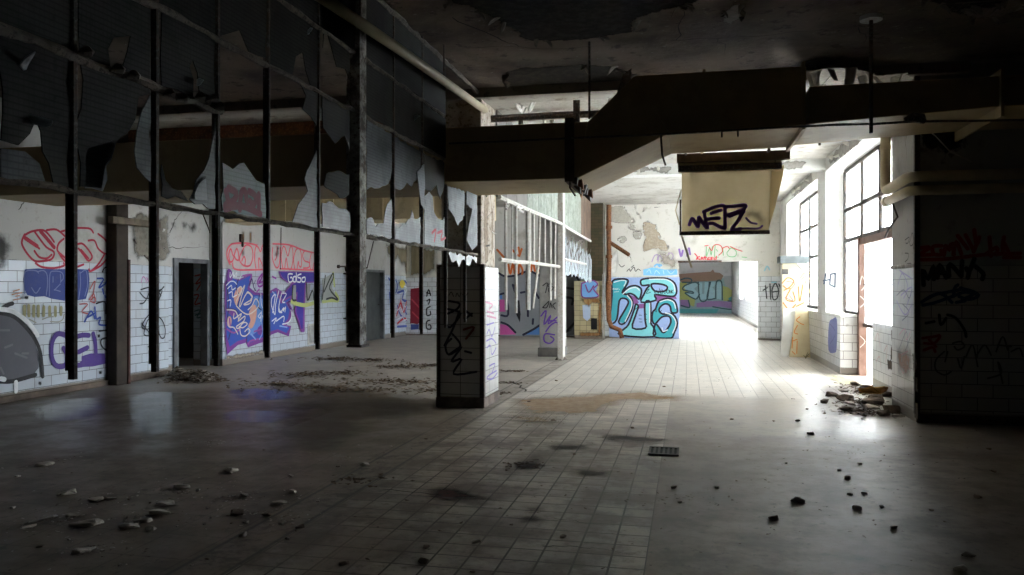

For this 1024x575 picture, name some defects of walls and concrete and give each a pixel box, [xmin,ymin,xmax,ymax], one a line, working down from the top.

flaking render [134,213,170,260]
flaking render [611,204,669,251]